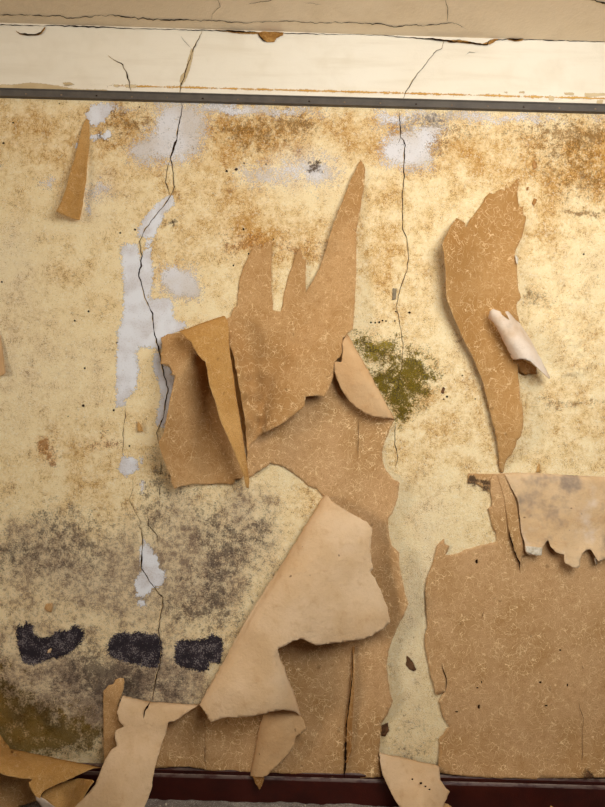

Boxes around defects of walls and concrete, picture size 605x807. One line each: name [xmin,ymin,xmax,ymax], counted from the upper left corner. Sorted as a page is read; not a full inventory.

crack [0,0,466,440]
mould [353,329,443,429]
mould [0,512,97,571]
crack [130,490,163,698]
mould [176,508,267,631]
mould [0,643,183,757]